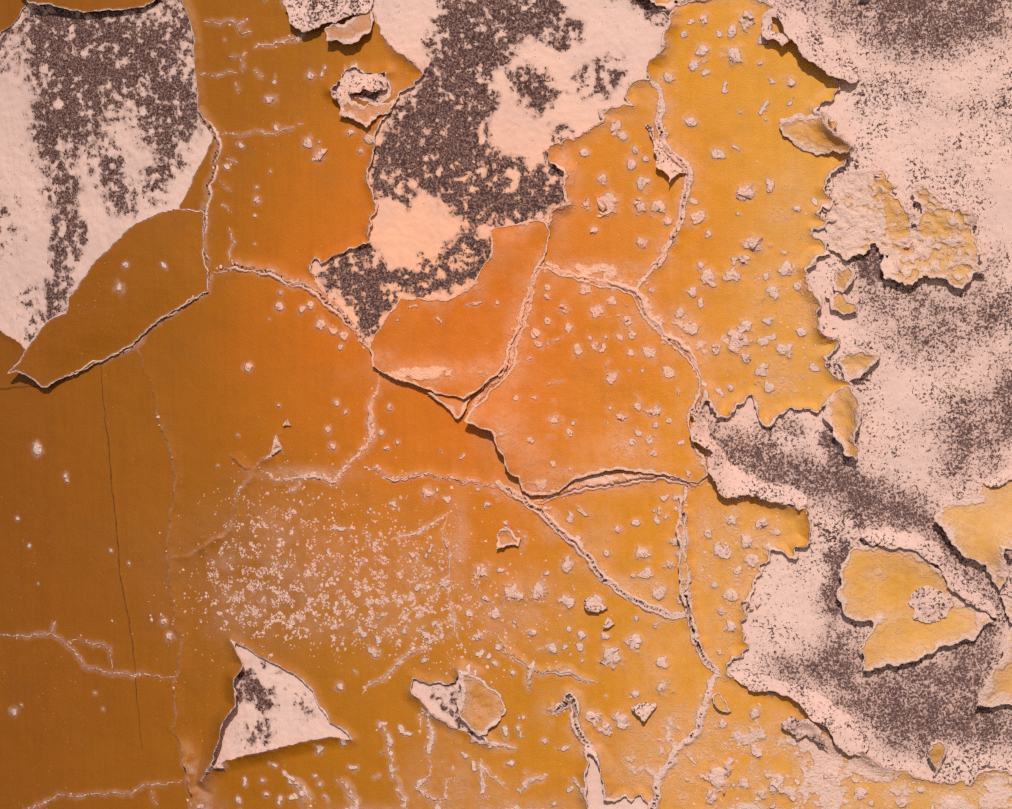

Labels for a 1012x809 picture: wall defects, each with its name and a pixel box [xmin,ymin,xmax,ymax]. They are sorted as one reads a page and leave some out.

peeling [0,0,213,388]
crack [28,780,190,809]
crack [0,110,370,746]
peeling [271,435,282,455]
peeling [212,643,350,768]
crack [258,373,721,809]
crack [466,81,703,413]
peeling [586,746,655,809]
peeling [311,0,1012,784]